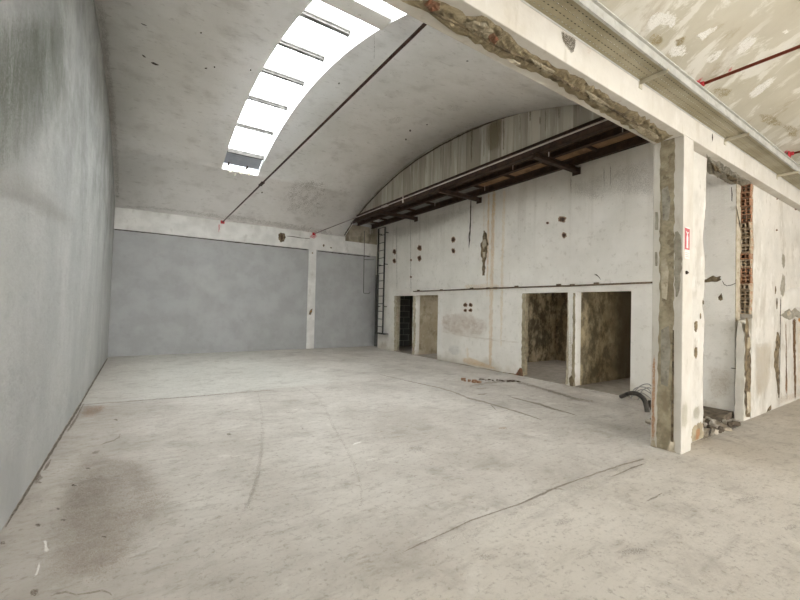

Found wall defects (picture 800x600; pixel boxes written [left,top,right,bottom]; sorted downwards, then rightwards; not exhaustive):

peeling [748,76,776,98]
spalling [401,0,704,453]
spalling [706,153,780,417]
crack [380,374,577,420]
crack [404,459,645,552]